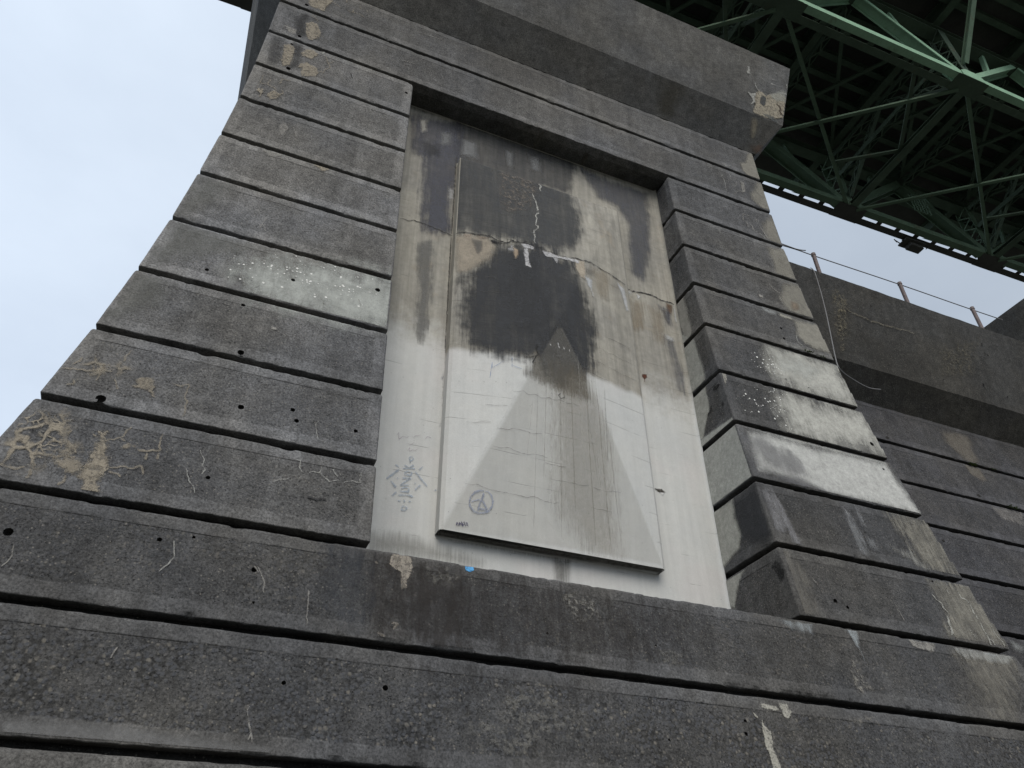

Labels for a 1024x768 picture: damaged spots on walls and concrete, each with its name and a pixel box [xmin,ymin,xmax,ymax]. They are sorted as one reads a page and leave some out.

peeling [281,0,368,77]
spalling [748,83,787,118]
water stain [411,116,596,399]
crack [400,157,673,352]
peeling [389,554,413,589]